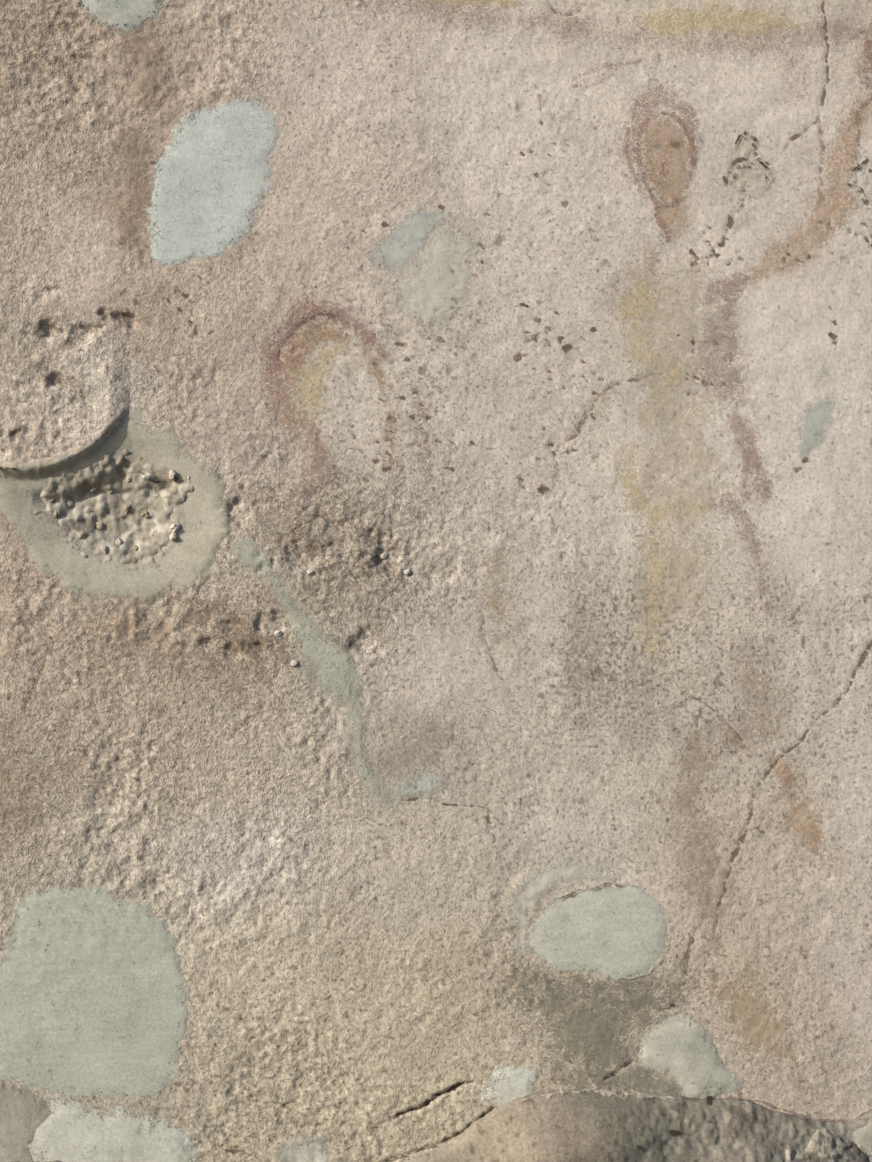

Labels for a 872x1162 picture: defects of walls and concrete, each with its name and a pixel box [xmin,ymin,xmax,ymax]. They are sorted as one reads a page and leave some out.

crack [786,1,829,215]
spalling [17,289,212,408]
crack [664,640,872,1009]
crack [363,1082,491,1162]